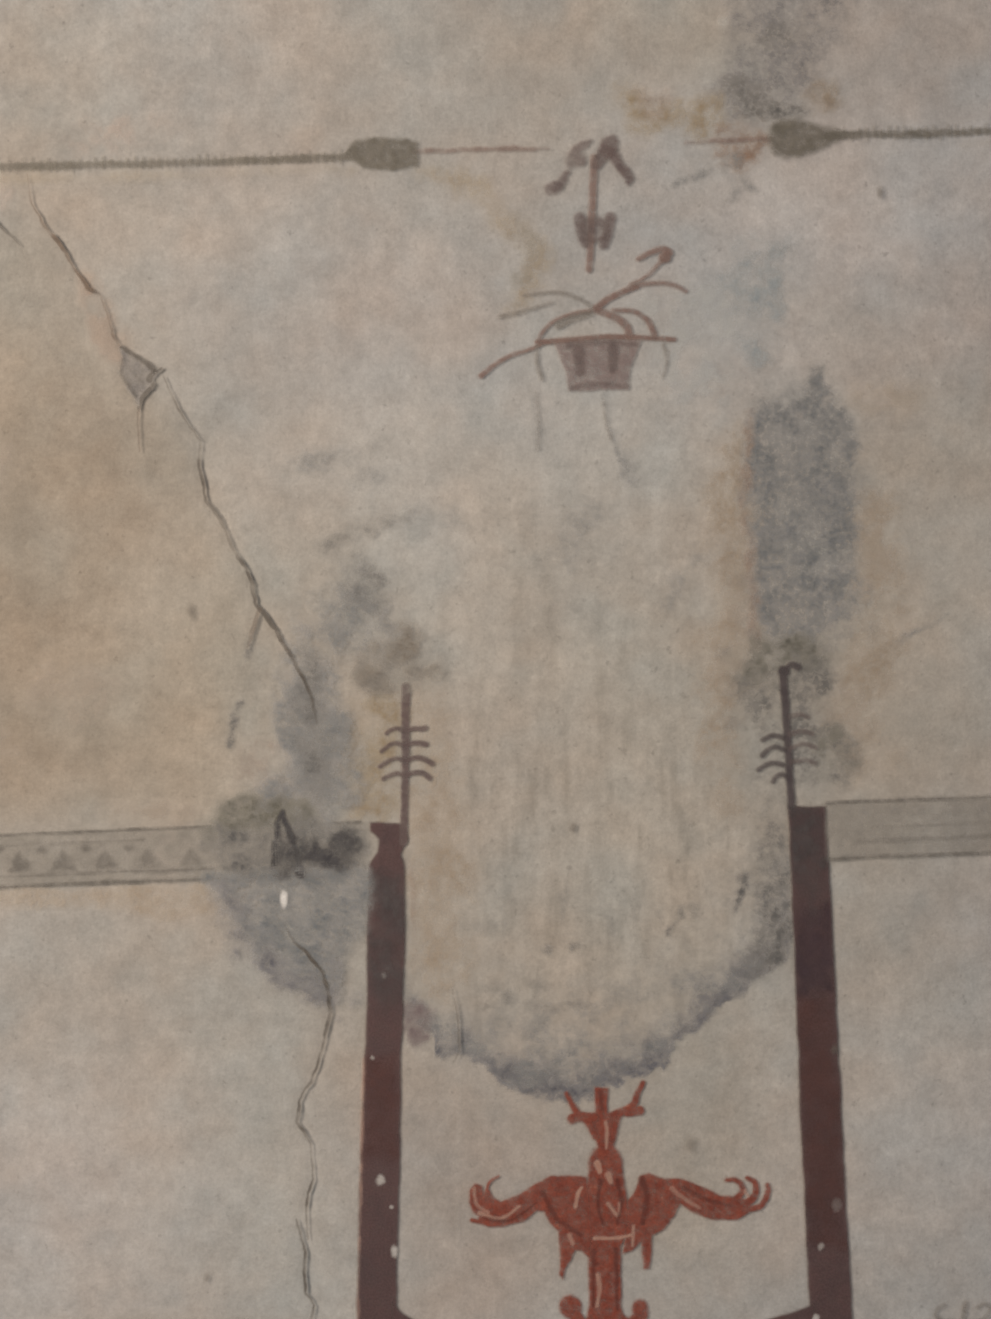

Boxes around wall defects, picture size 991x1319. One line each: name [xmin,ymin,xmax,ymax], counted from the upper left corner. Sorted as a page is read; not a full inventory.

crack [35,209,94,292]
crack [197,458,313,706]
damp [700,372,900,778]
damp [190,647,470,1005]
crack [296,945,331,1135]
damp [403,820,813,1103]
crack [297,1178,315,1316]